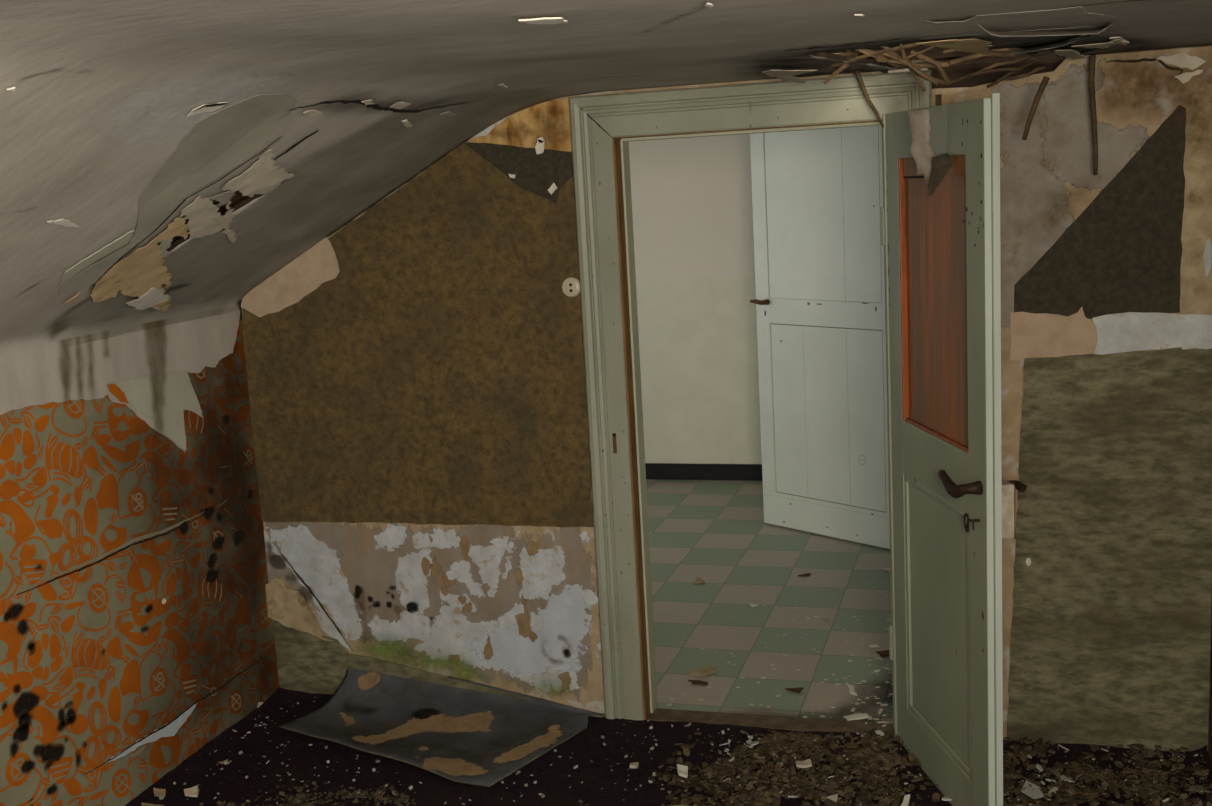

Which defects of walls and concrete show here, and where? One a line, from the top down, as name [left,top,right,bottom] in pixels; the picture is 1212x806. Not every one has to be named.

crack [274,99,465,161]
peeling [47,218,80,227]
peeling [65,149,298,312]
flaking render [991,37,1212,360]
peeling [241,237,340,317]
leakage [54,328,92,396]
leakage [146,320,164,410]
leakage [150,398,256,713]
leakage [4,604,35,653]
peeling [264,522,601,698]
leakage [2,685,86,773]